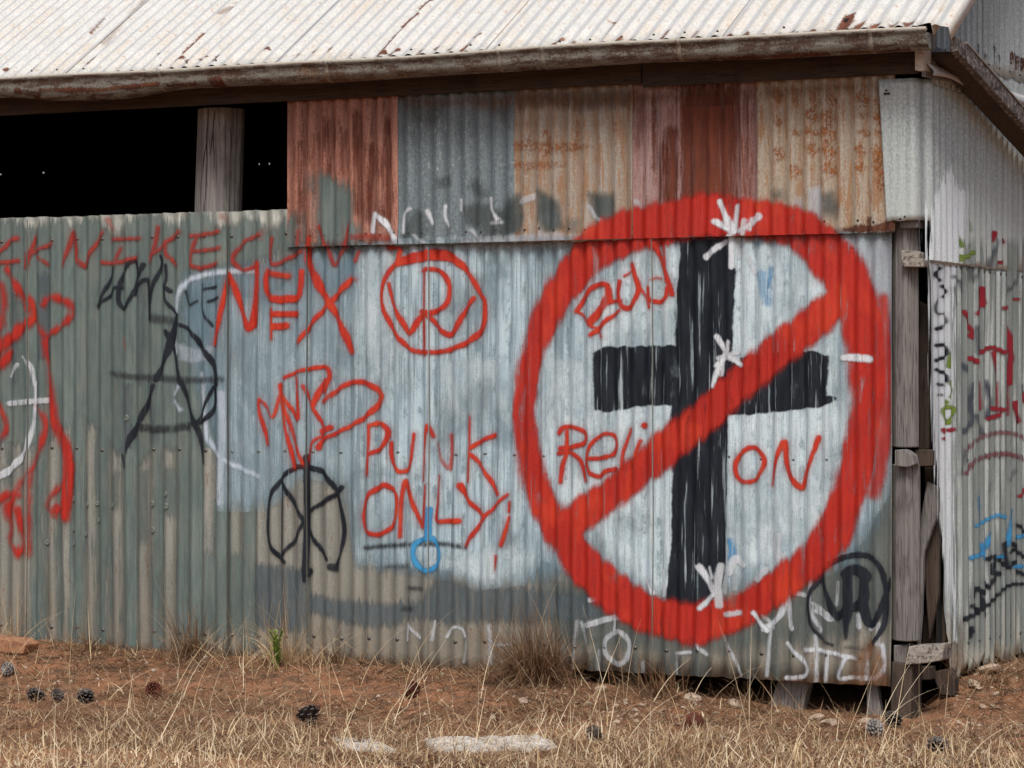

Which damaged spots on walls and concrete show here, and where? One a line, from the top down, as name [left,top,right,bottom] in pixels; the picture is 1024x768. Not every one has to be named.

corrosion [837,13,915,30]
corrosion [353,111,391,222]
corrosion [514,130,584,168]
corrosion [660,84,750,204]
corrosion [792,93,837,174]
corrosion [854,91,884,190]
corrosion [843,216,895,233]